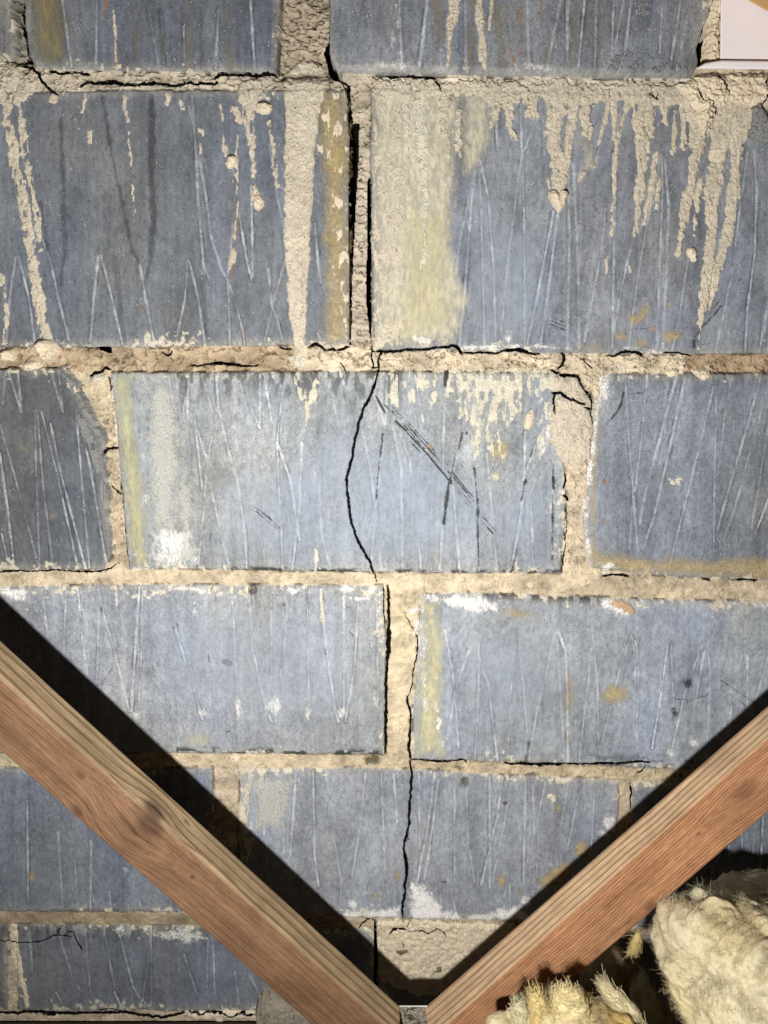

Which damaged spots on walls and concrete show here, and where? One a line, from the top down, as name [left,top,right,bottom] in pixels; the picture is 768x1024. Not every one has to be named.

crack [21,5,276,95]
crack [279,33,691,985]
crack [0,928,82,951]